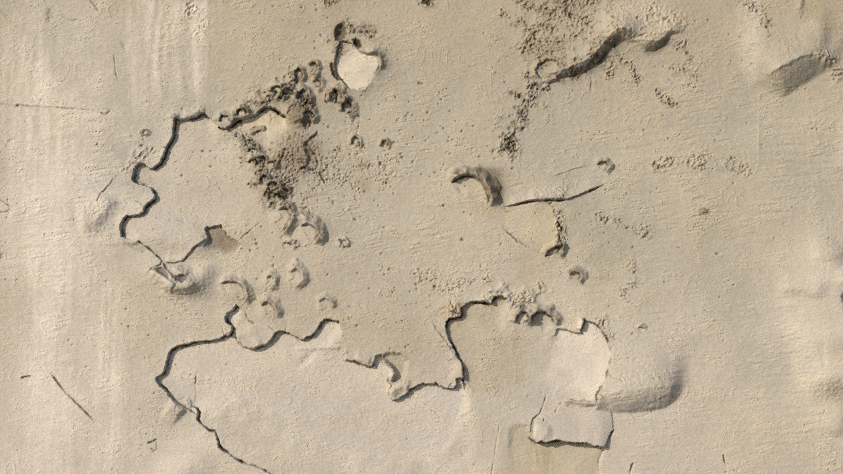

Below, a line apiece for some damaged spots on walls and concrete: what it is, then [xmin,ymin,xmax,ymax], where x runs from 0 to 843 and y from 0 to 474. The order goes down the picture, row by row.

spalling [321,20,393,99]
peeling [117,77,321,262]
crack [194,372,274,474]
peeling [152,269,616,474]